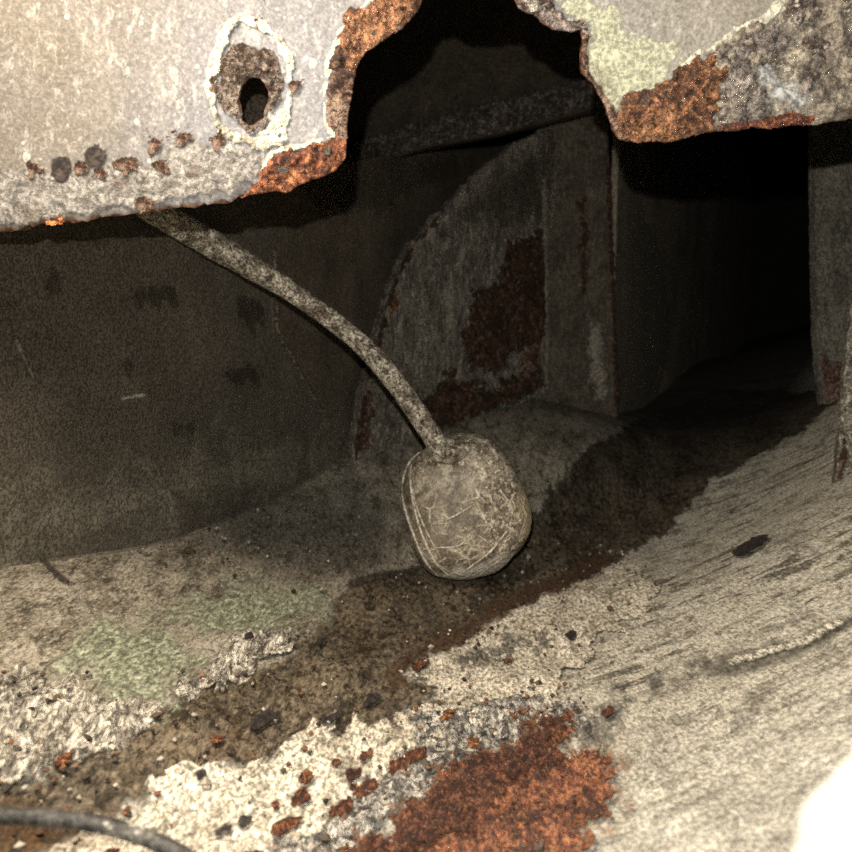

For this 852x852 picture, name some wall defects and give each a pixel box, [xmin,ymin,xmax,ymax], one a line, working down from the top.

peeling [202,0,349,170]
peeling [554,0,788,111]
rust [517,0,852,143]
rust [421,229,551,430]
rust [821,354,852,403]
leakage [0,387,845,817]
rust [328,747,378,819]
rust [340,705,630,852]